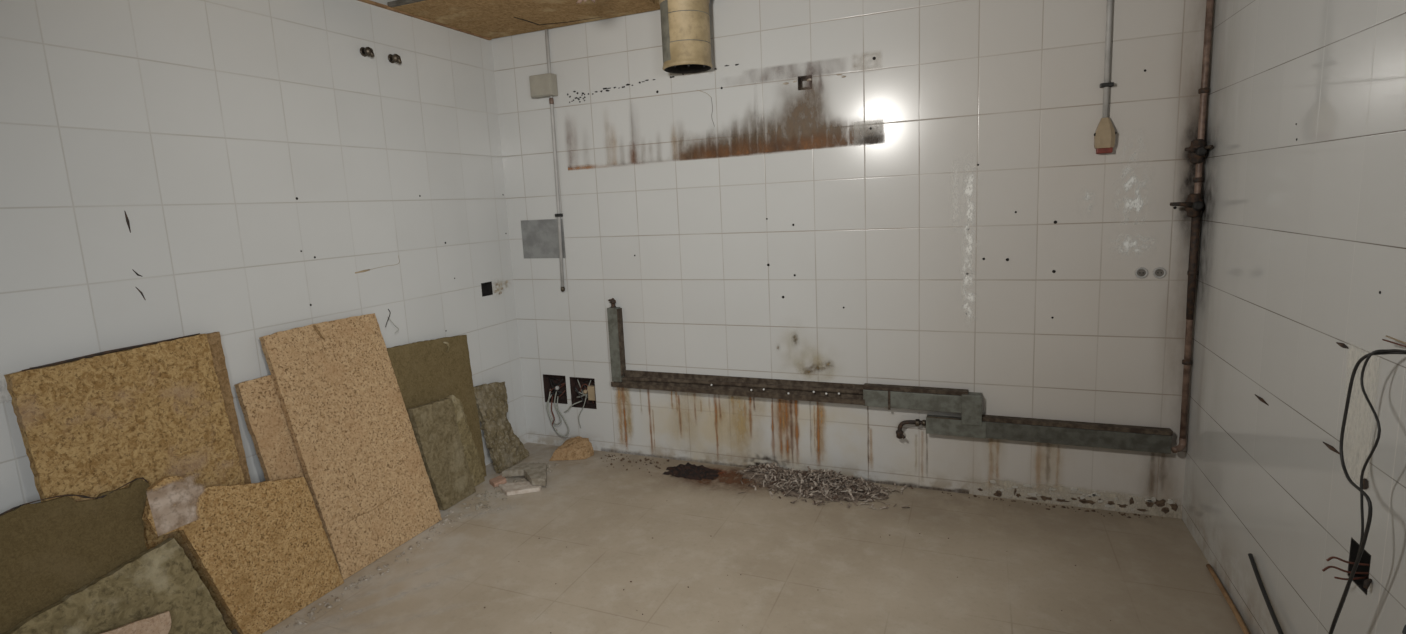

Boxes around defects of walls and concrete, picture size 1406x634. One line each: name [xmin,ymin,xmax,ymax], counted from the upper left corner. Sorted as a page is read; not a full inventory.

rust [681,138,821,160]
rust [772,399,823,459]